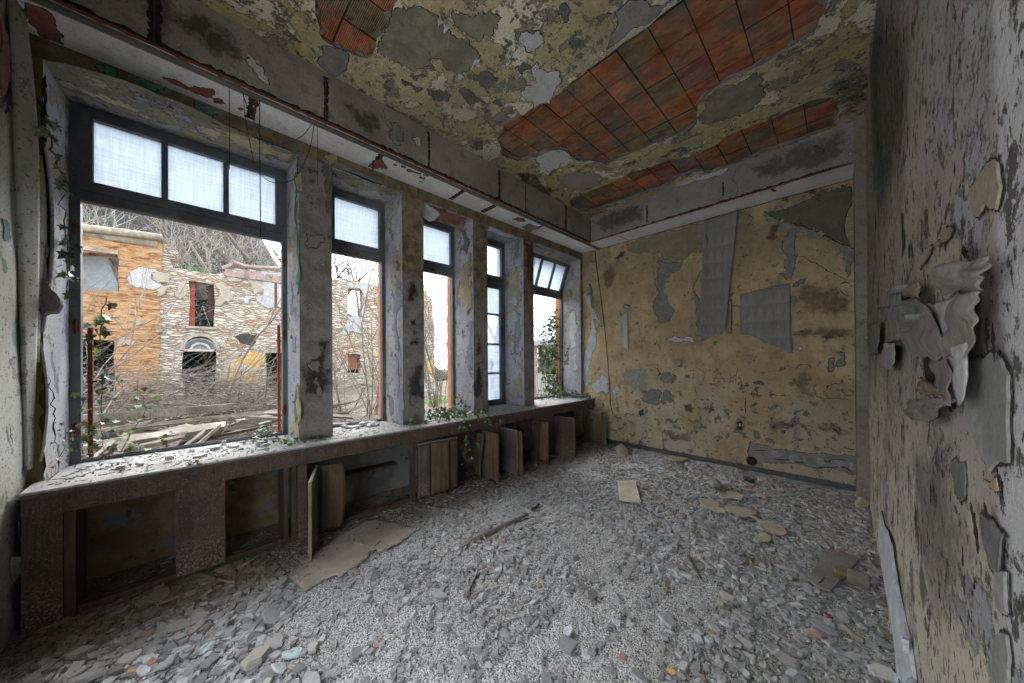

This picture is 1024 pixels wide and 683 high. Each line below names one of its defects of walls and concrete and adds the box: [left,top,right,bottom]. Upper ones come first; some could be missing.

peeling [315,0,502,106]
spalling [498,0,828,173]
peeling [0,0,303,471]
spalling [565,97,839,242]
peeling [764,182,854,307]
peeling [968,156,1004,221]
crack [38,372,58,474]
peeling [910,558,927,611]